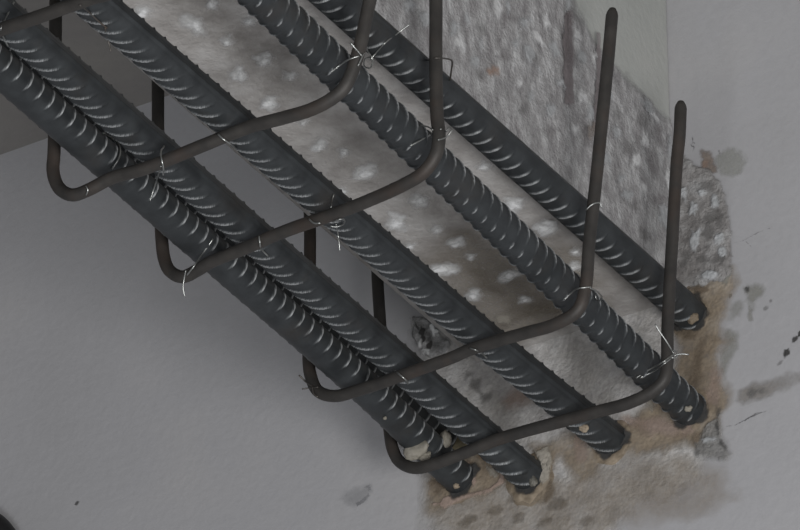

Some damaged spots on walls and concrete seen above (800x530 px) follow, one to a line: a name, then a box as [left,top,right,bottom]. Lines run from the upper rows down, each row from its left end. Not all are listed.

spalling [375,0,429,58]
spalling [442,0,602,199]
spalling [599,66,673,267]
spalling [676,157,732,287]
flaking render [412,316,459,361]
spalling [436,357,552,431]
spalling [524,330,642,405]
spalling [608,402,650,425]
spalling [622,306,662,356]
damp [740,383,778,401]
spalling [422,409,730,530]